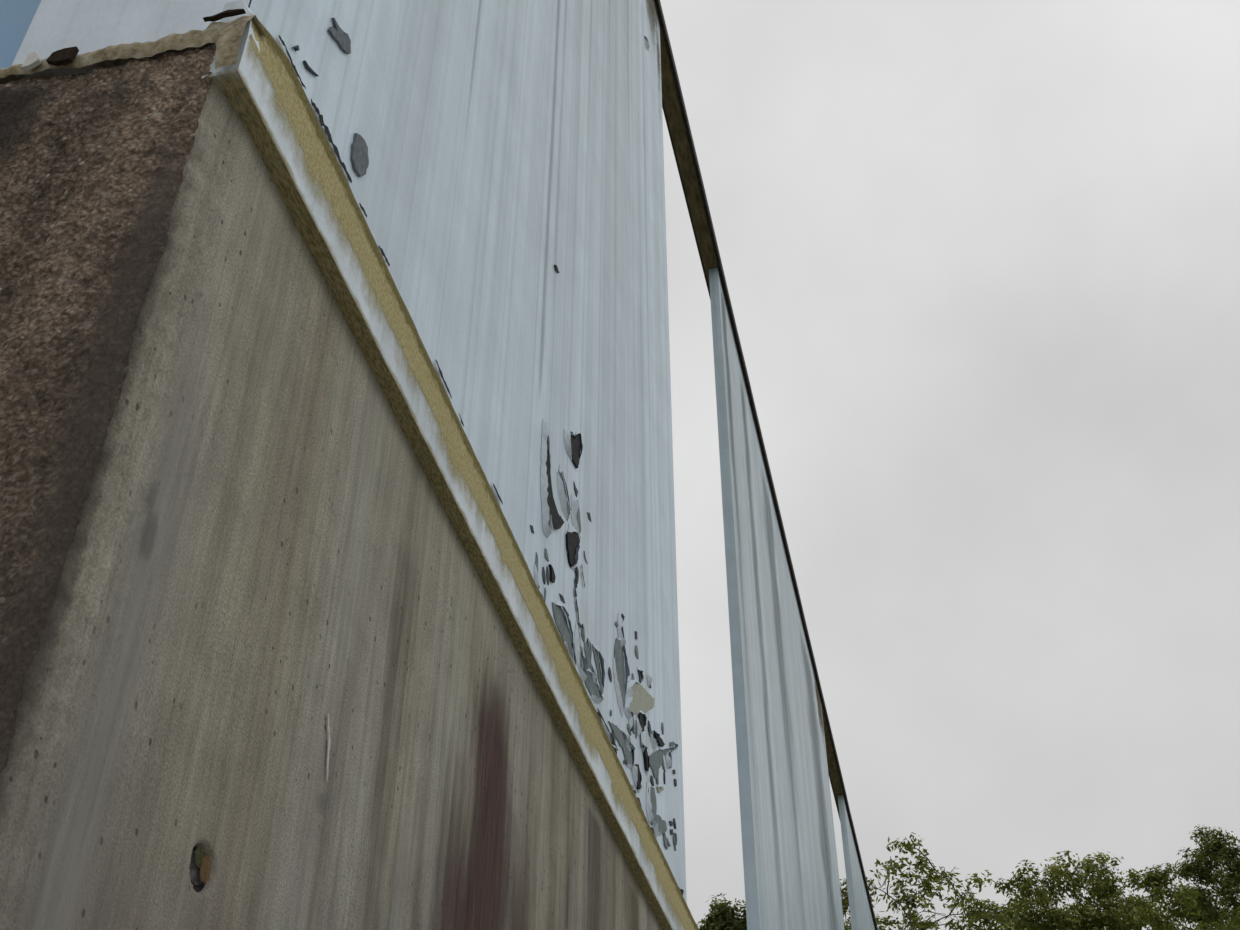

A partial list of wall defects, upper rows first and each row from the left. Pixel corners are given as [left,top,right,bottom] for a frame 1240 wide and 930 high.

spalling [0,9,265,682]
peeling [327,18,351,54]
peeling [350,133,369,177]
corrosion [205,70,673,930]
peeling [530,418,678,851]